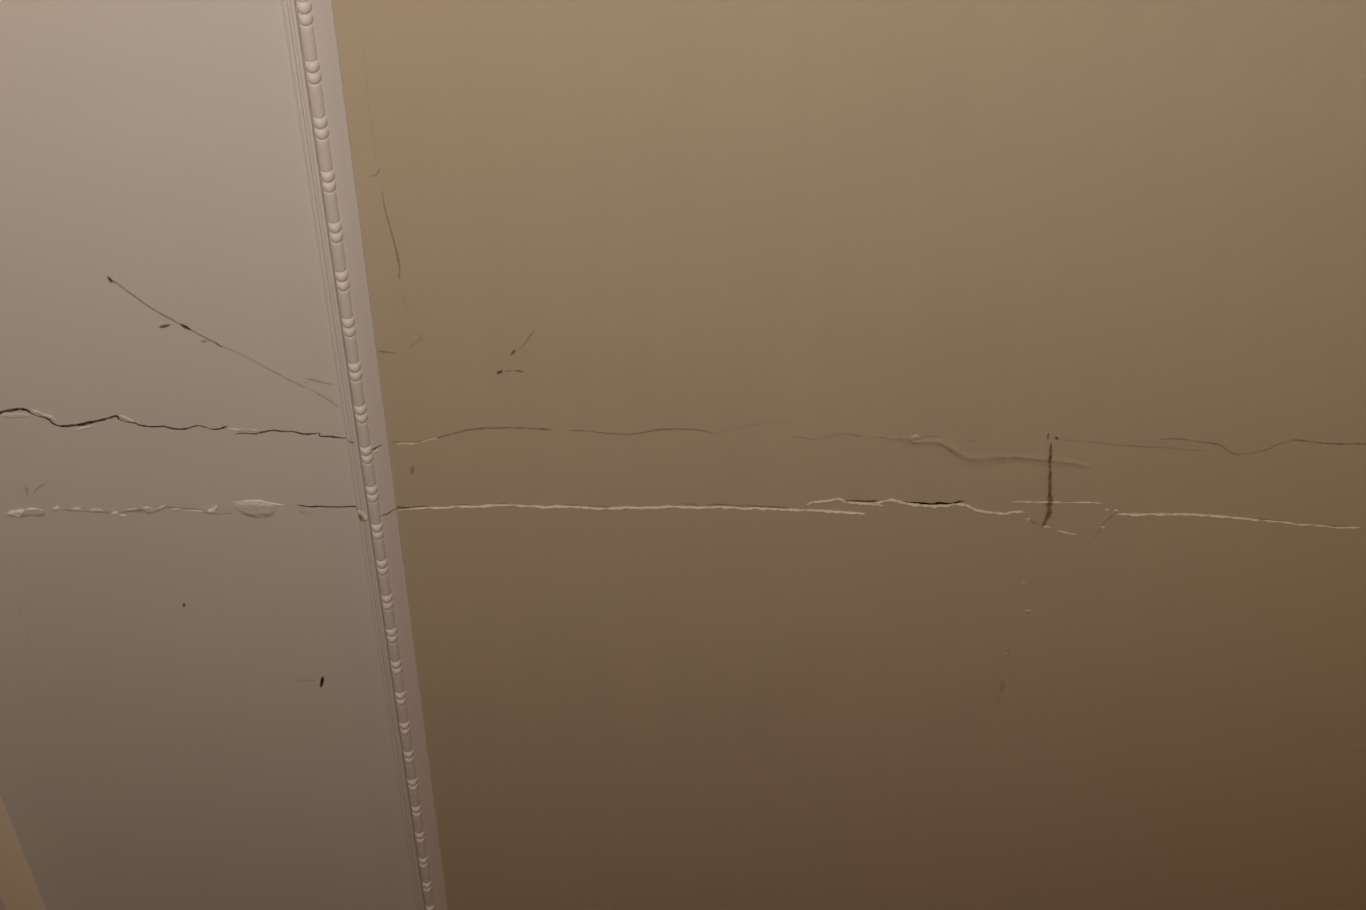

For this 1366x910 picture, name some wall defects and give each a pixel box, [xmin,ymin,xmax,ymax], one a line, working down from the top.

crack [0,407,439,454]
crack [299,433,1360,535]
crack [7,503,217,518]